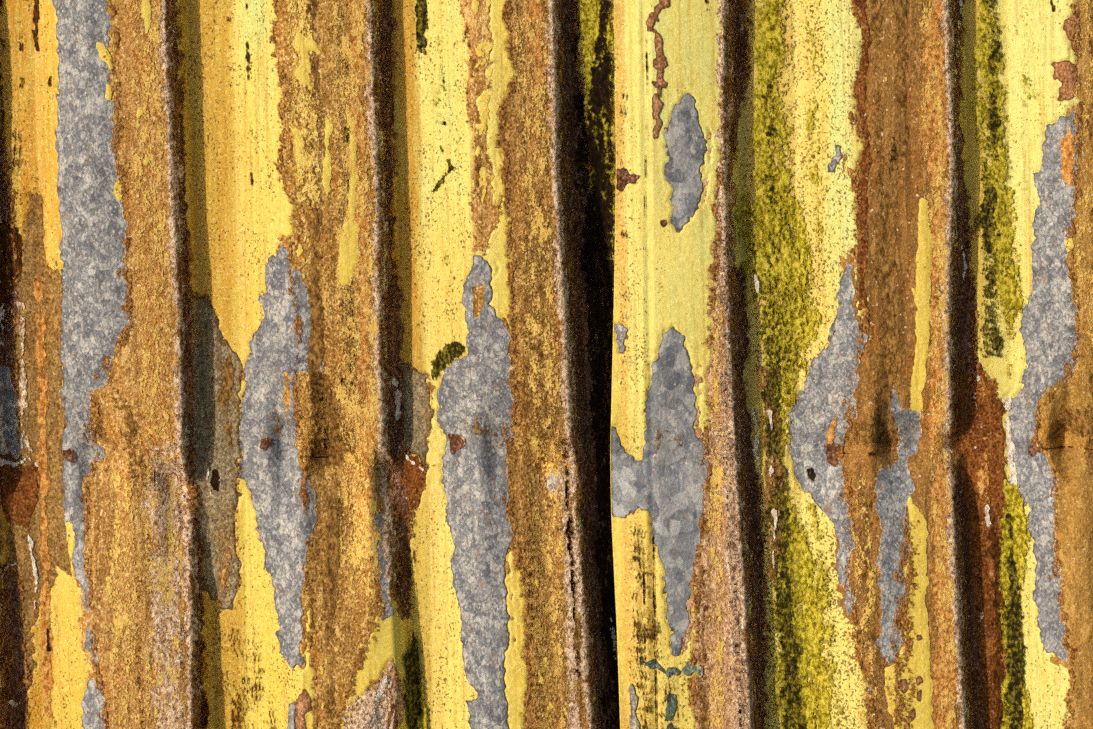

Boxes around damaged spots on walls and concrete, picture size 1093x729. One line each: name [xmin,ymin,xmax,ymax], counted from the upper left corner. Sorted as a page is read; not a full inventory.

peeling [0,0,132,718]
rust [74,0,213,729]
peeling [185,244,324,668]
rust [269,0,415,729]
peeling [389,0,515,729]
rust [495,0,620,729]
peeling [611,324,709,656]
rust [681,0,770,729]
peeling [789,263,868,614]
rust [833,0,1011,729]
peeling [1002,109,1083,664]
rust [1029,0,1093,729]